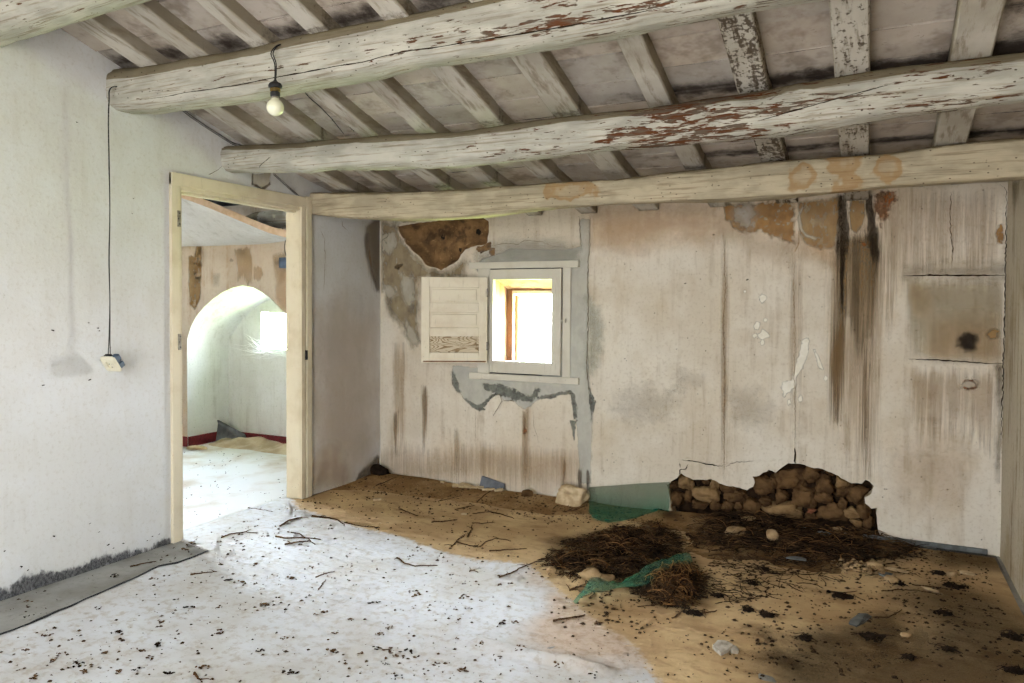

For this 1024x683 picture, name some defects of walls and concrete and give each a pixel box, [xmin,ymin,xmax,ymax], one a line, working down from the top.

flaking render [397,218,495,270]
leakage [831,195,879,429]
peeling [782,338,828,405]
flaking render [669,463,879,535]